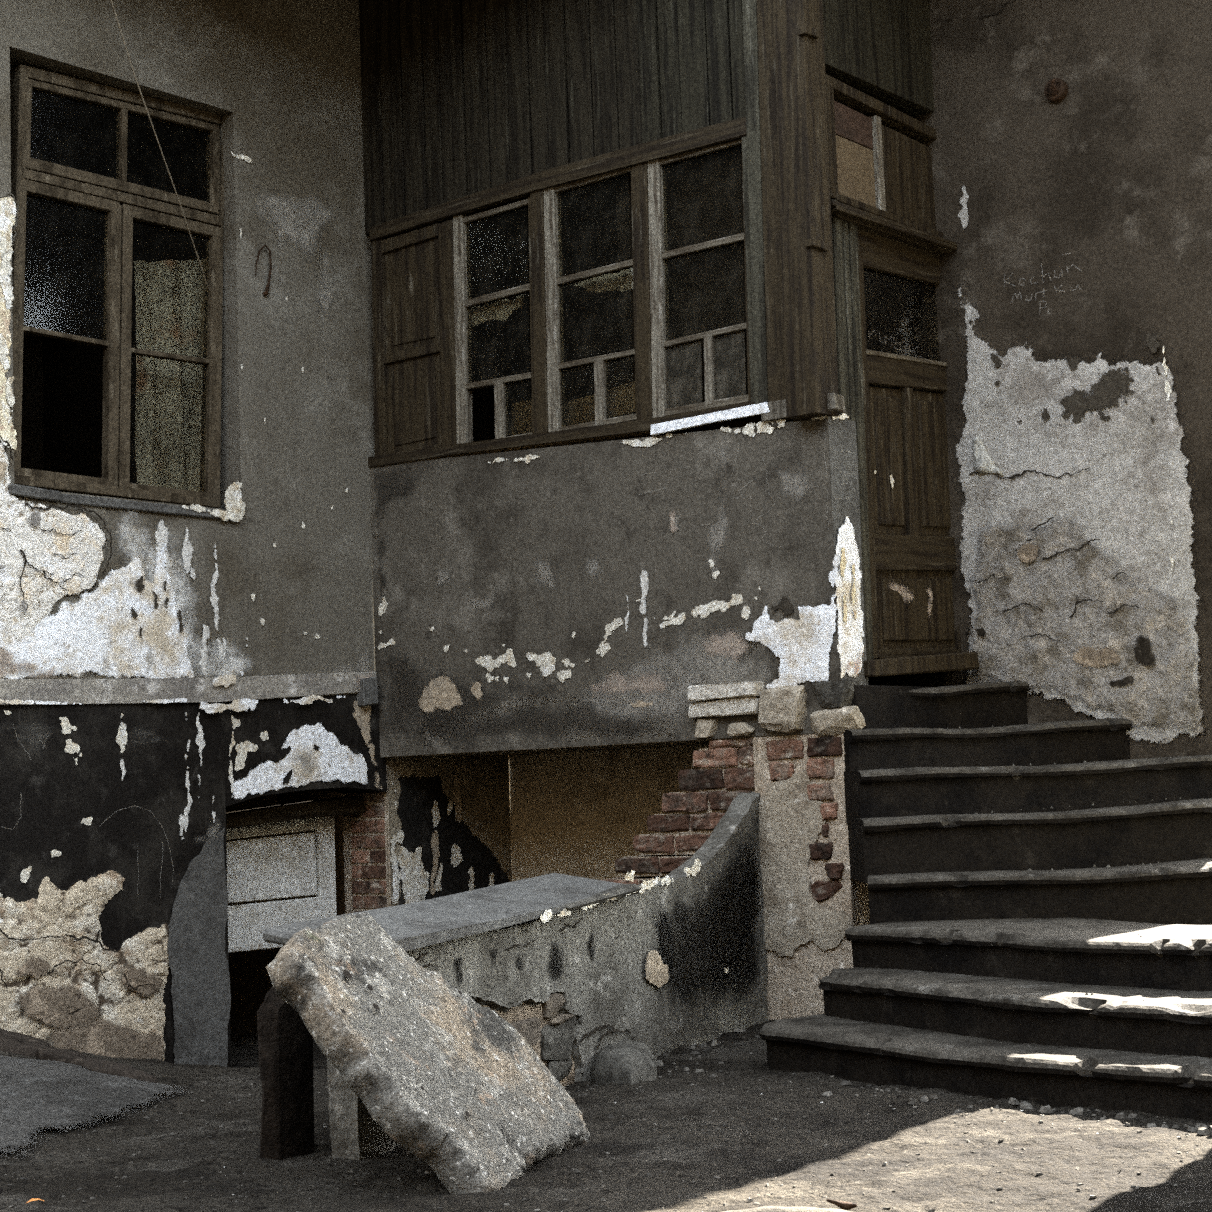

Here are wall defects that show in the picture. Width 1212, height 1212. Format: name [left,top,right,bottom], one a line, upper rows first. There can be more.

peeling [0,193,19,481]
crack [0,435,14,461]
crack [0,503,112,614]
spalling [0,526,200,679]
spalling [182,481,246,522]
peeling [199,648,368,799]
peeling [378,597,388,616]
peeling [464,618,624,685]
spalling [654,516,864,738]
peeling [955,288,1204,744]
spalling [0,866,169,1061]
leakage [658,844,758,999]